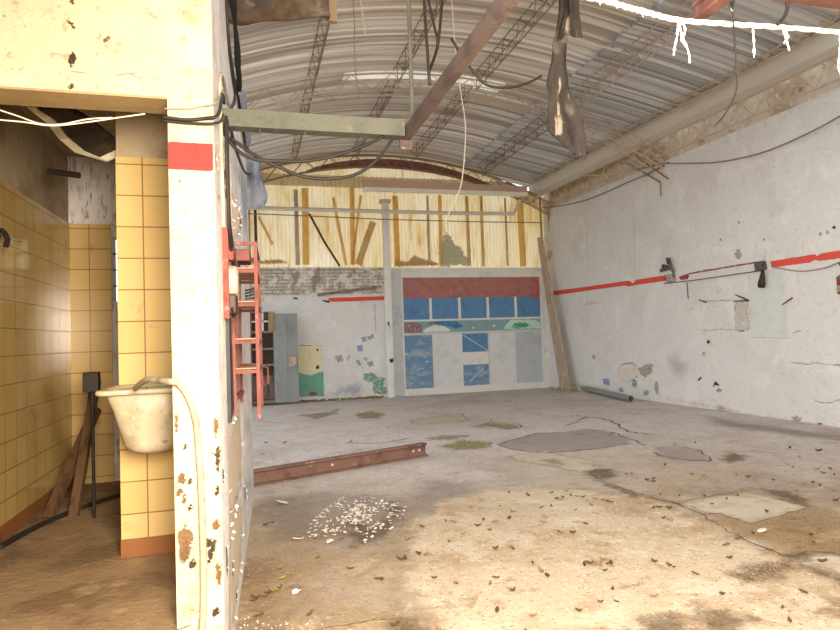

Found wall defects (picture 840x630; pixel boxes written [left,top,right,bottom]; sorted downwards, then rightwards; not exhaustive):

peeling [224,155,243,238]
spalling [734,301,750,331]
spalling [619,365,659,395]
crack [474,415,712,461]
spalling [176,473,193,510]
peeling [207,410,248,630]
crack [587,471,840,556]
spalling [178,524,196,568]